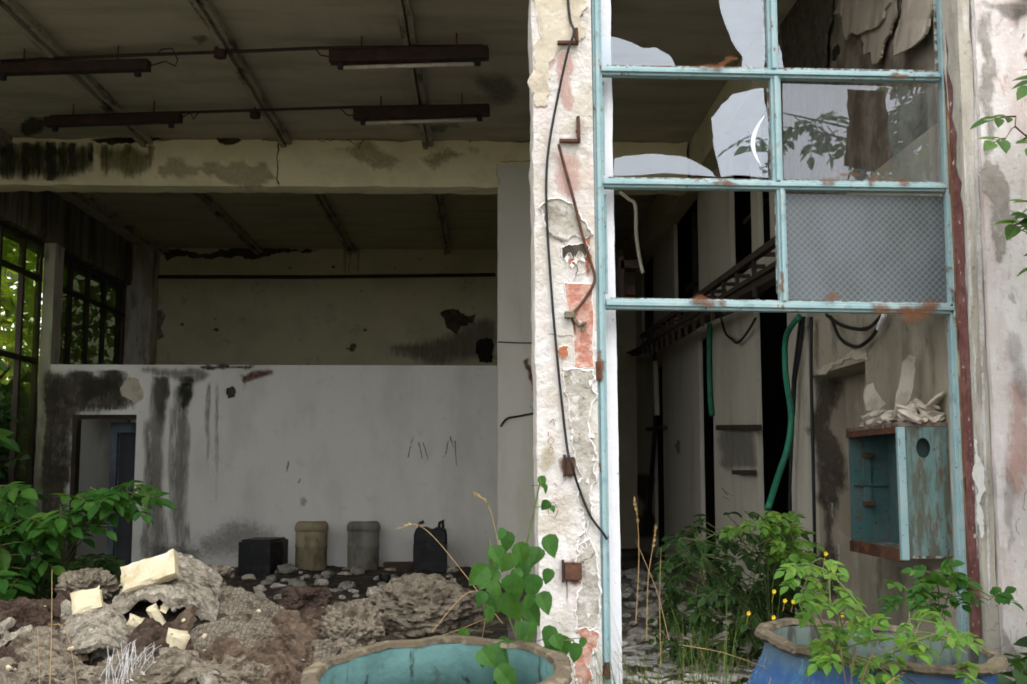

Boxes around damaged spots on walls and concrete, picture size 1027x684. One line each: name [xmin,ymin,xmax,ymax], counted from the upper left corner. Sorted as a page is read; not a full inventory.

peeling [528,0,588,110]
leakage [0,117,152,180]
spalling [160,248,320,263]
leakage [41,370,133,519]
peeling [120,377,144,403]
leakage [144,364,252,555]
spalling [439,308,476,335]
hole [475,338,494,363]
spalling [538,156,603,684]
leakage [807,378,845,597]
rust [873,301,939,323]
rust [929,75,970,587]